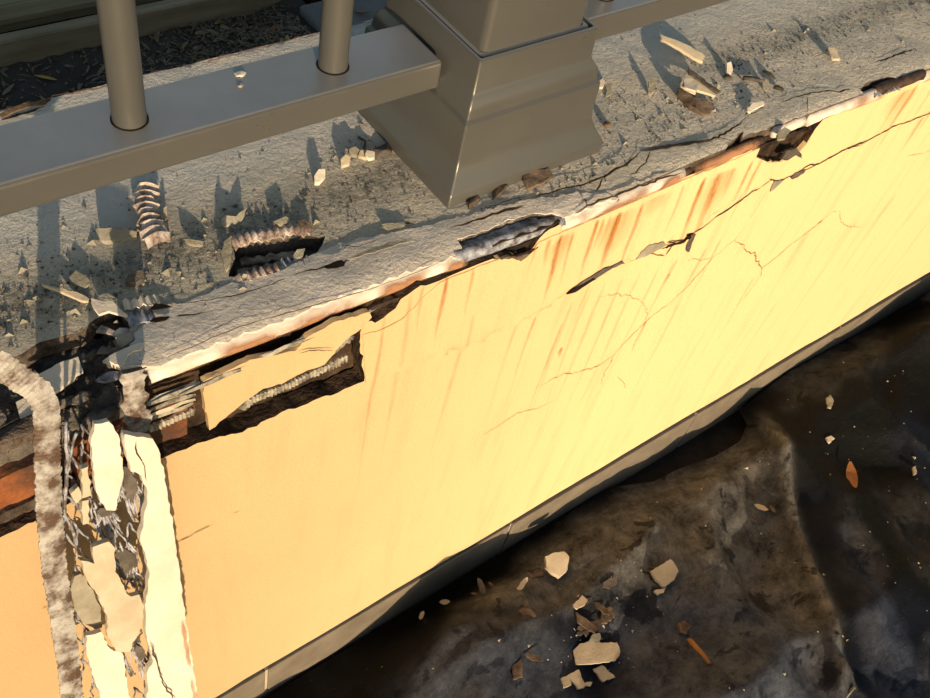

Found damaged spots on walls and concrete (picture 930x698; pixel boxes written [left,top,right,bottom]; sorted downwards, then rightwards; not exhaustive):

crack [866,48,916,62]
spalling [220,209,317,283]
rust [378,275,423,298]
rust [593,191,646,246]
crack [451,35,851,228]
rust [660,176,682,191]
crack [486,113,930,434]
rust [689,143,757,219]
spalling [0,383,36,524]
spalling [27,270,172,525]
flaking render [144,298,399,445]
flaking render [79,538,144,698]